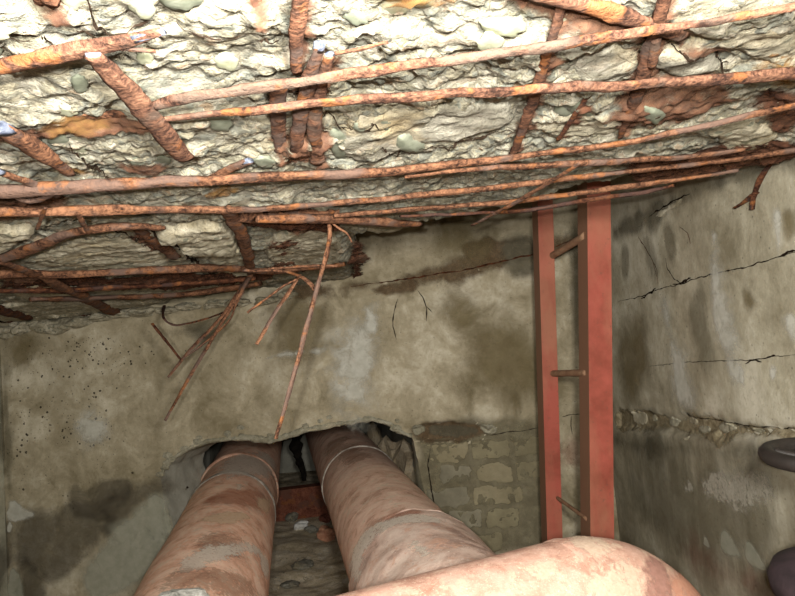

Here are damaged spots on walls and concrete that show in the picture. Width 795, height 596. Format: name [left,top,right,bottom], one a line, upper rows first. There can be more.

rust [45,117,105,136]
spalling [0,0,795,226]
rust [611,72,733,127]
rust [627,80,795,182]
rust [0,196,66,208]
rust [57,223,342,294]
crack [618,240,795,302]
spalling [0,177,553,478]
crack [655,355,790,366]
spalling [615,409,795,449]
flaking render [412,419,542,552]
damp [0,481,163,596]